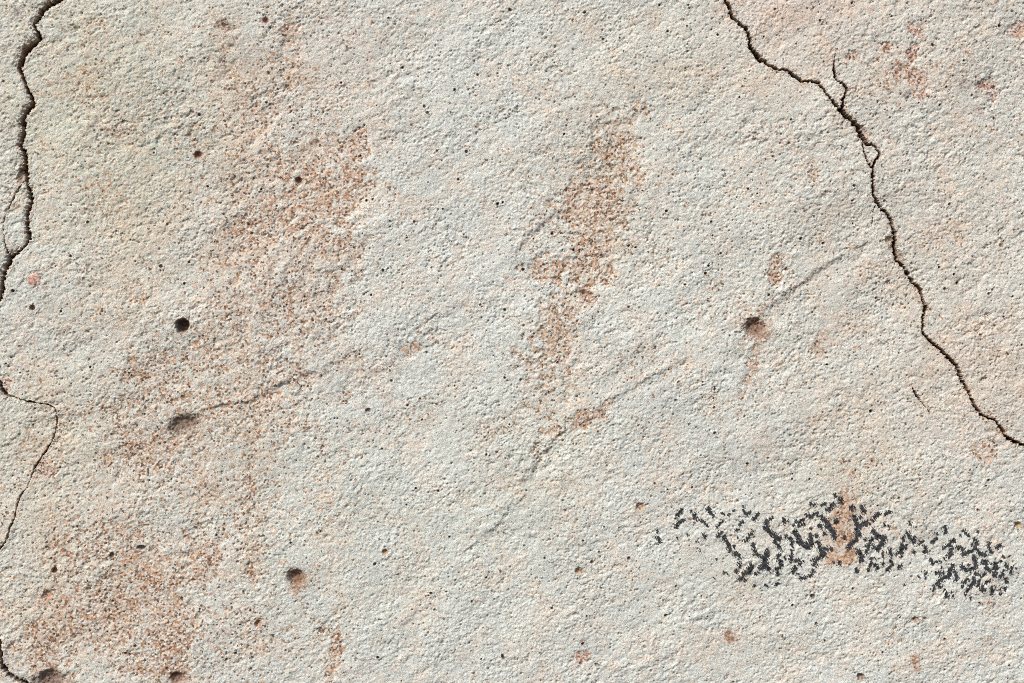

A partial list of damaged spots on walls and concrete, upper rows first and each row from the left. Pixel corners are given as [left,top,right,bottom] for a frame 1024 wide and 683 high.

crack [0,0,66,309]
crack [720,0,1024,450]
crack [0,374,62,554]
crack [0,633,28,683]